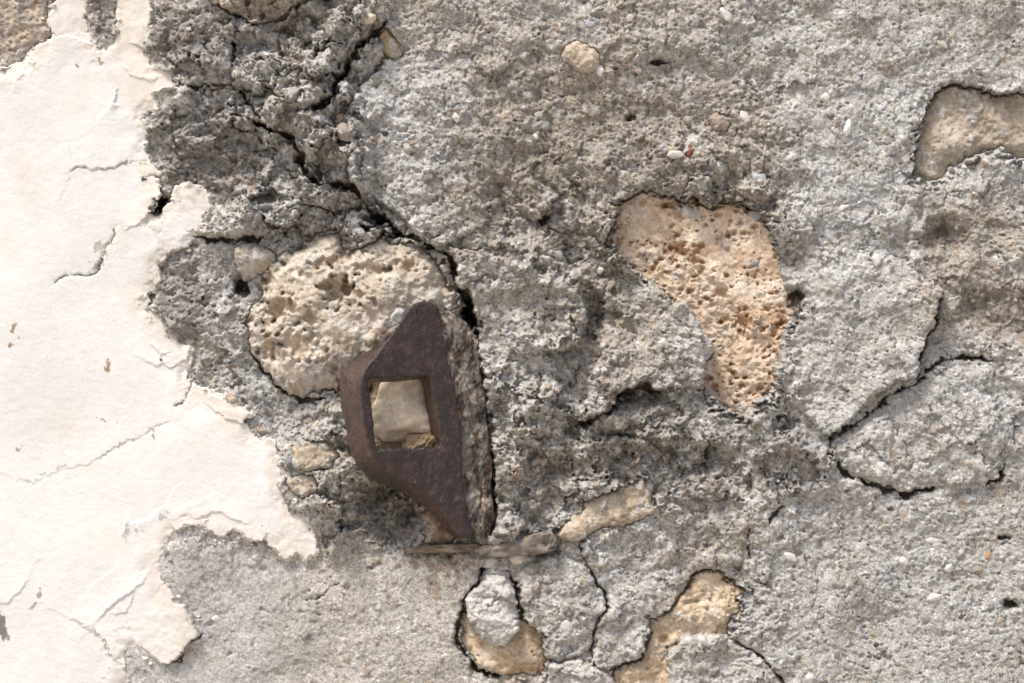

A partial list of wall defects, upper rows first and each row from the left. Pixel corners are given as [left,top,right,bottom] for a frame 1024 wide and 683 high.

flaking render [0,0,261,232]
crack [171,2,479,335]
flaking render [245,233,459,400]
flaking render [606,187,798,414]
crack [829,299,984,499]
flaking render [109,585,202,665]
flaking render [276,536,318,562]
crack [454,567,499,676]
crack [510,576,547,637]
crack [579,546,697,670]
flaking render [612,569,745,683]
crack [737,641,784,683]